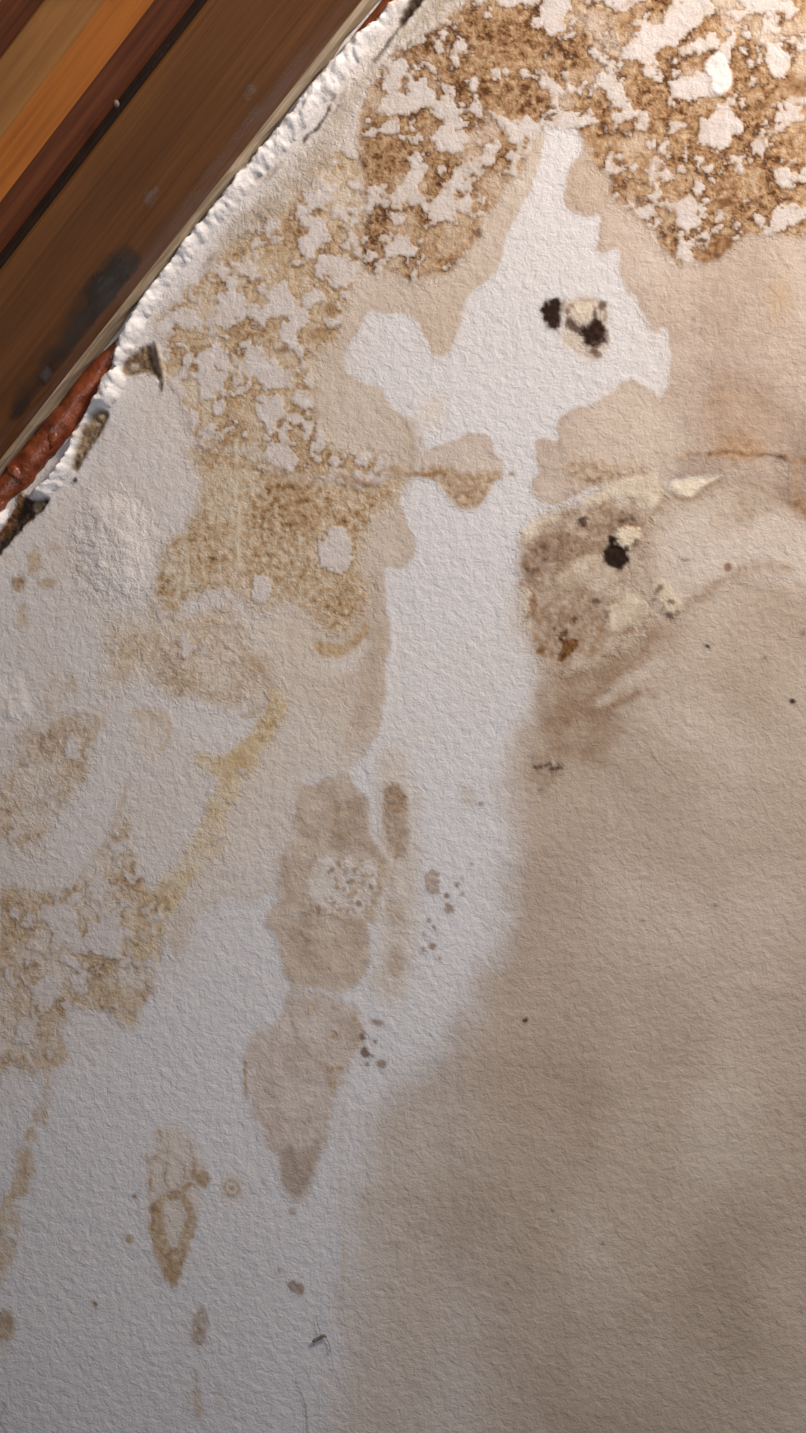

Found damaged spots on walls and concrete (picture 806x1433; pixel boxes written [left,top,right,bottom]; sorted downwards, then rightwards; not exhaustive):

leakage [137,1118,213,1291]
peeling [0,0,806,1085]
leakage [166,135,806,1433]